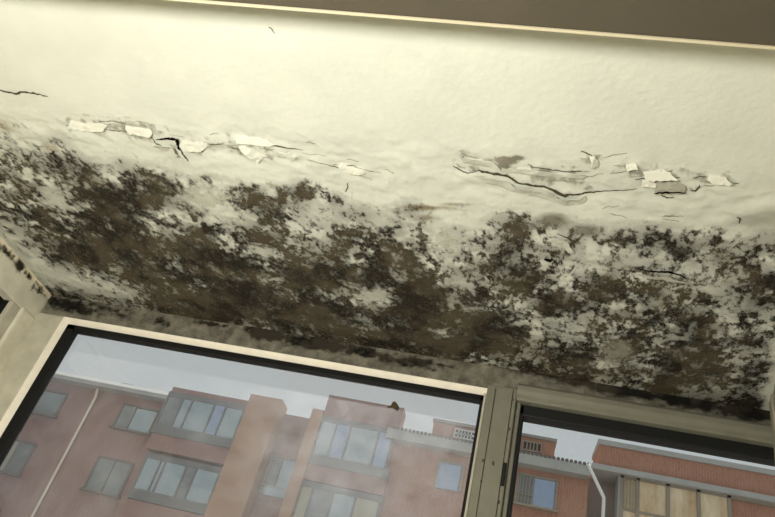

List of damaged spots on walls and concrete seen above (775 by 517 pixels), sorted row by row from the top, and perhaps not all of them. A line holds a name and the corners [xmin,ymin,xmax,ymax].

crack [0,89,48,97]
peeling [66,119,394,180]
peeling [453,151,680,206]
peeling [691,175,738,192]
water stain [0,140,775,422]